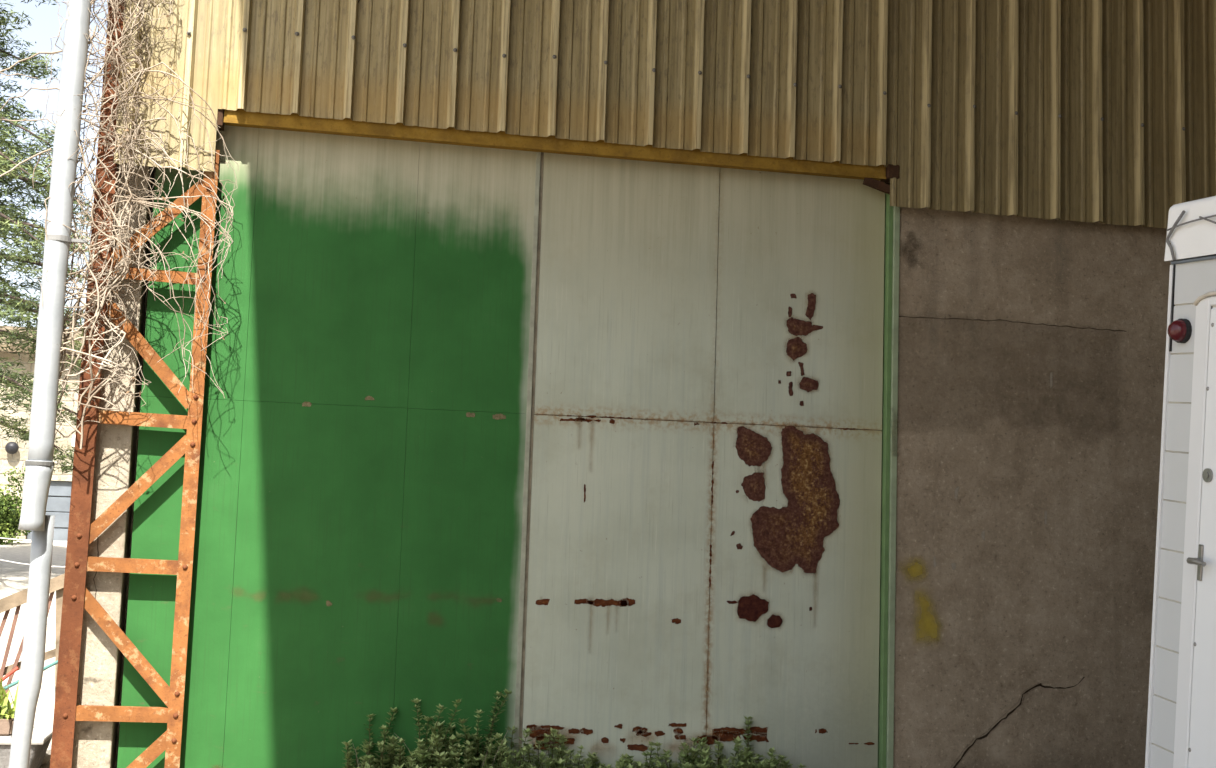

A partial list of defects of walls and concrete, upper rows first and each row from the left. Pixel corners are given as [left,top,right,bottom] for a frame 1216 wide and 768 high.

corrosion [778,293,823,406]
corrosion [560,415,632,424]
corrosion [694,422,840,573]
corrosion [574,598,635,607]
corrosion [727,594,782,628]
corrosion [526,723,769,752]
crack [950,677,1085,768]